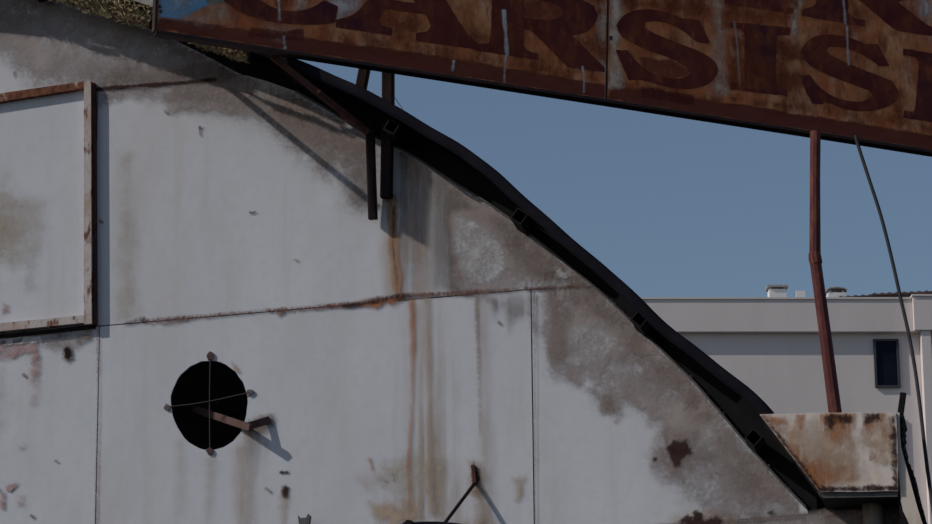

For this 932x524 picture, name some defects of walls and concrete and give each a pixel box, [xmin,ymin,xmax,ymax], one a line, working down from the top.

rust [96,77,217,91]
water stain [0,0,367,202]
rust [126,195,570,359]
water stain [400,152,863,524]
spalling [653,440,703,472]
rust [766,413,898,491]